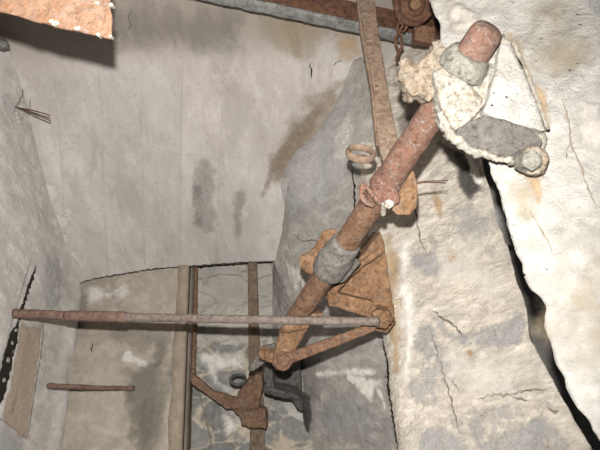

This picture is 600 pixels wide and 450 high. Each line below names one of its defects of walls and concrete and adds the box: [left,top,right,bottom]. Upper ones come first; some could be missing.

crack [81,261,272,283]
damp [271,90,354,214]
crack [349,161,357,208]
crack [529,211,552,252]
crack [562,98,597,206]
crack [0,265,36,404]
crack [0,322,45,439]
crack [428,310,467,434]
crack [479,389,546,402]